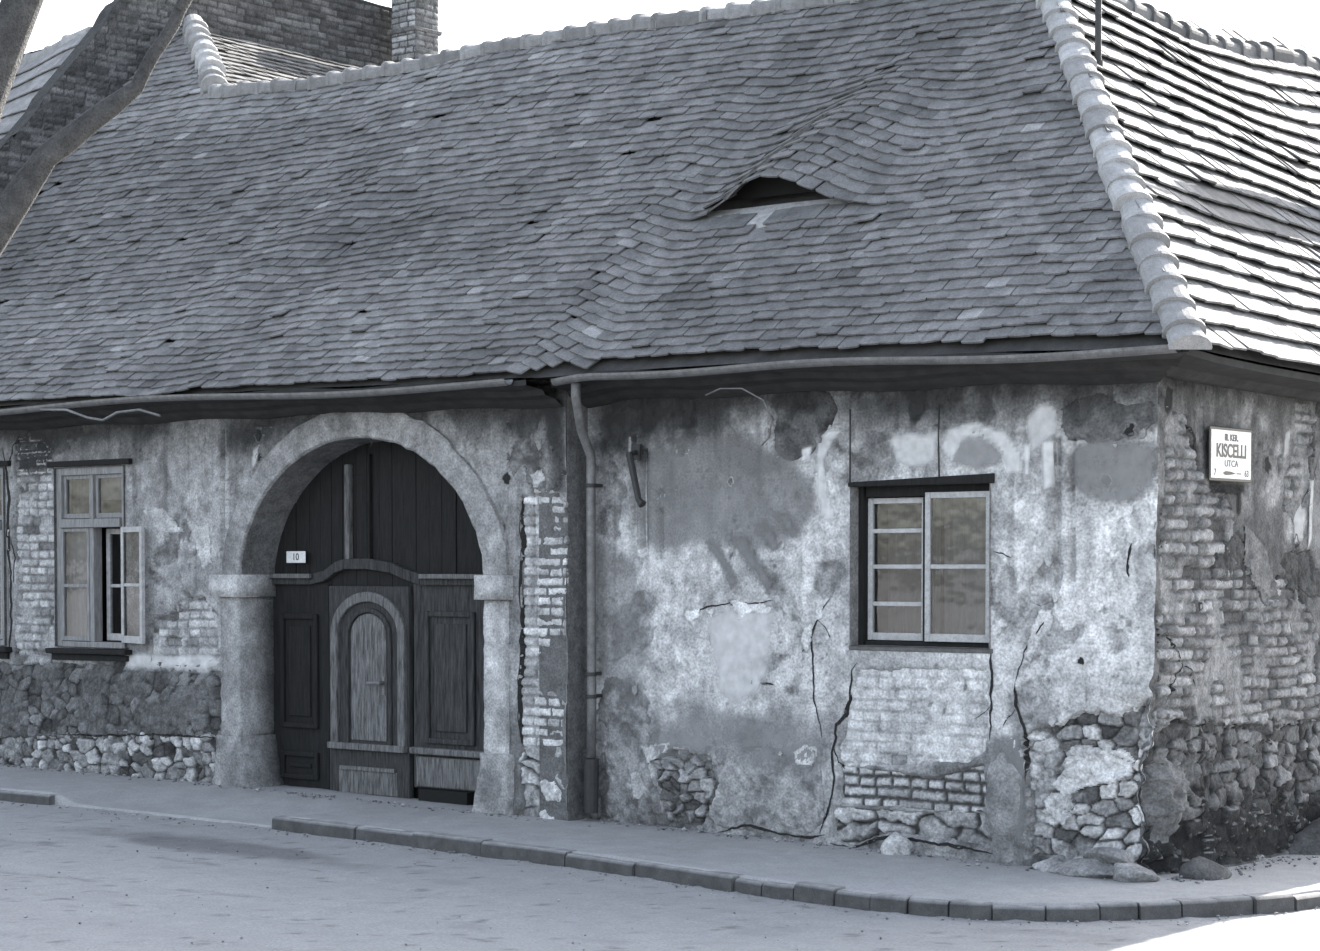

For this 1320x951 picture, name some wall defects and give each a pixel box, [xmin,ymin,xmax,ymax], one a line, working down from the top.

spalling [0,440,222,740]
spalling [500,433,570,749]
spalling [1061,379,1320,727]
spalling [708,745,826,836]
crack [720,596,993,854]
spalling [840,668,990,813]
flaking render [1044,745,1136,826]